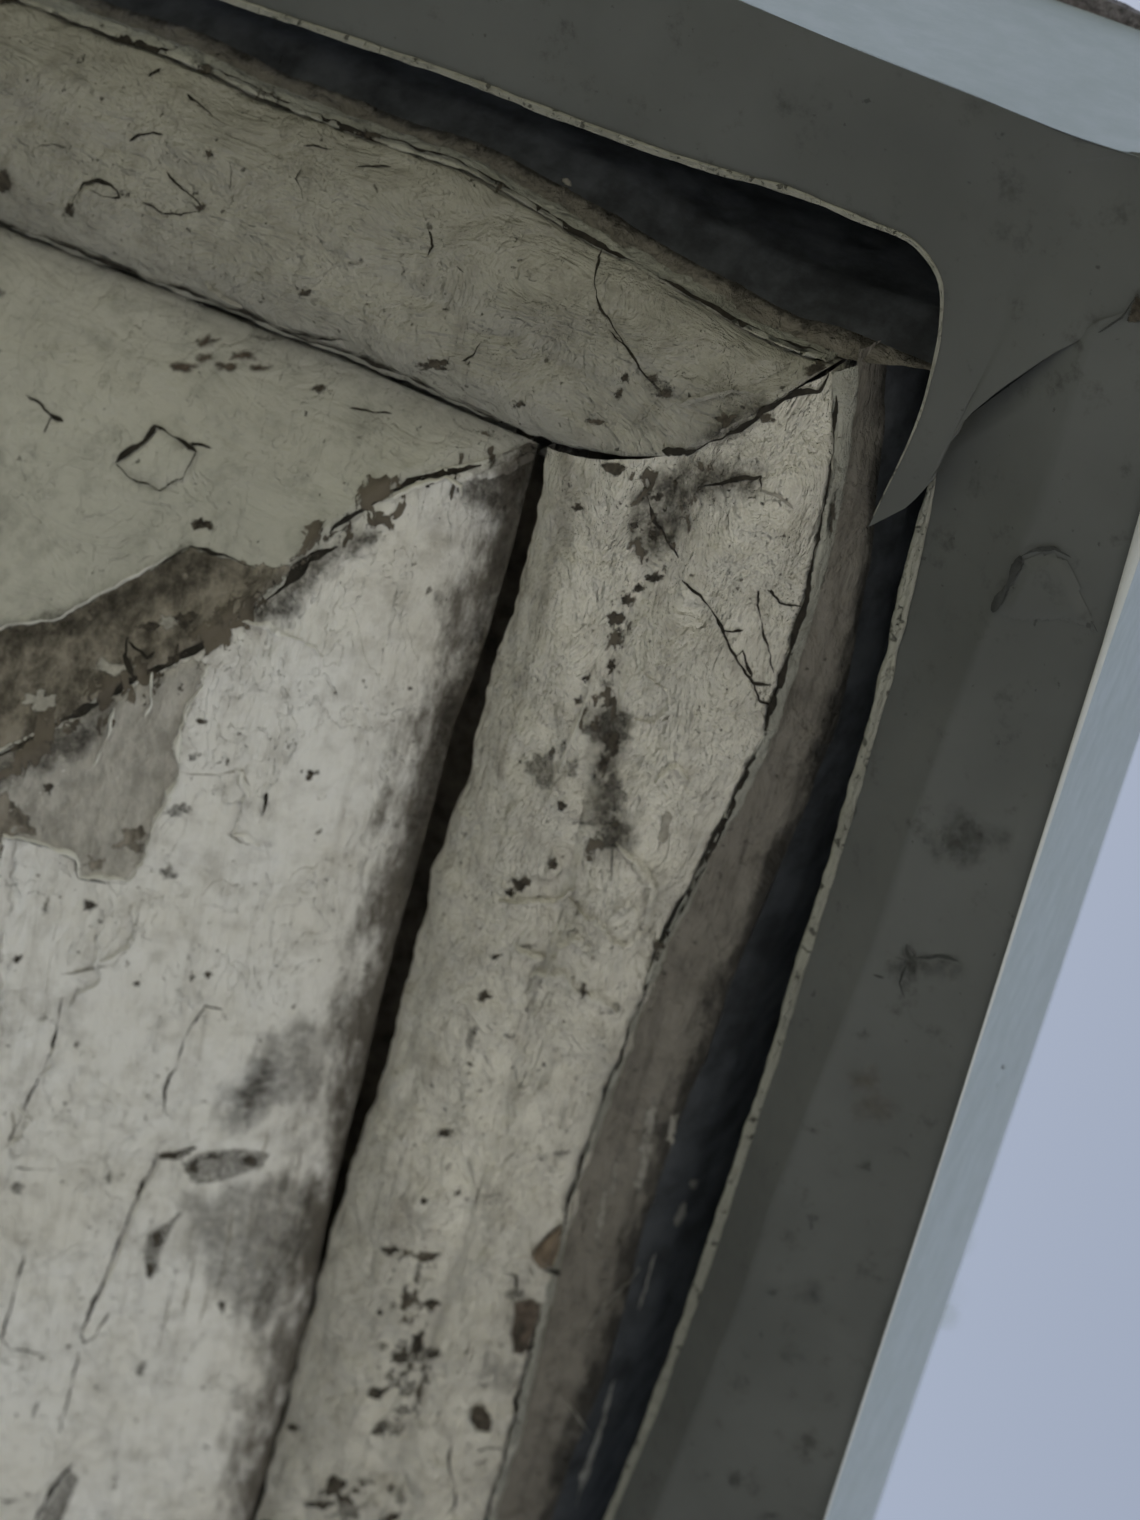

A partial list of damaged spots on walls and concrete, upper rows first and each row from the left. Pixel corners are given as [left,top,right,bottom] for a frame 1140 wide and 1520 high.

peeling [170,335,269,372]
peeling [0,517,324,1041]
crack [0,0,838,1239]
crack [447,1311,541,1520]